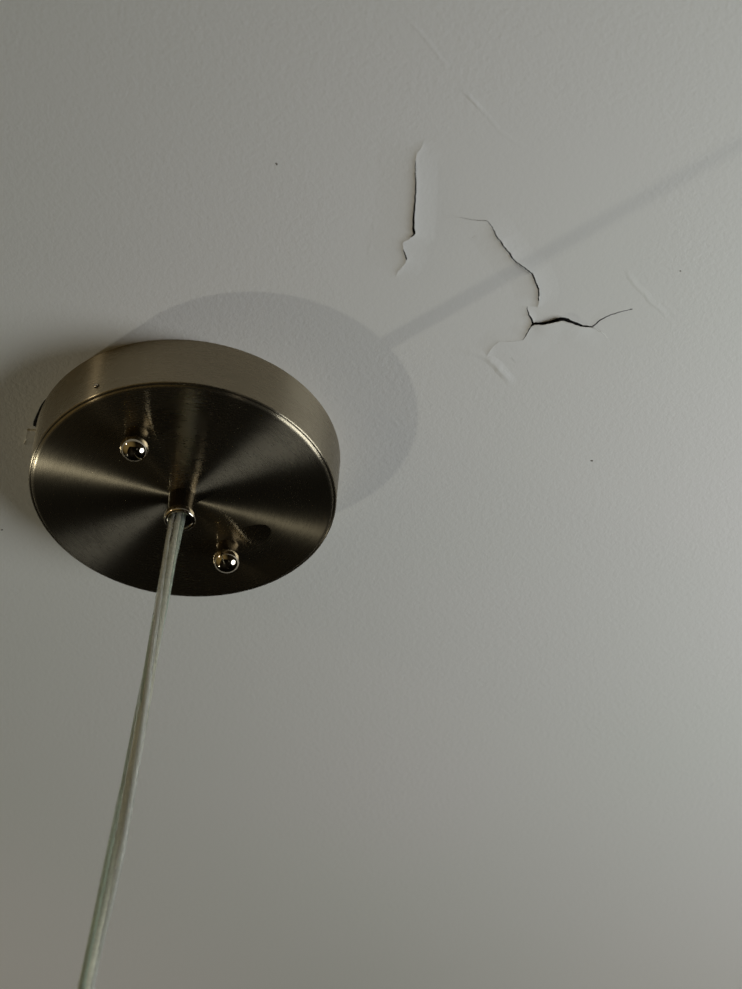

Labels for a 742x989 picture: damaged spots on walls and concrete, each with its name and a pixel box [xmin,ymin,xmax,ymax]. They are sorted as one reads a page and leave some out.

crack [365,130,633,364]